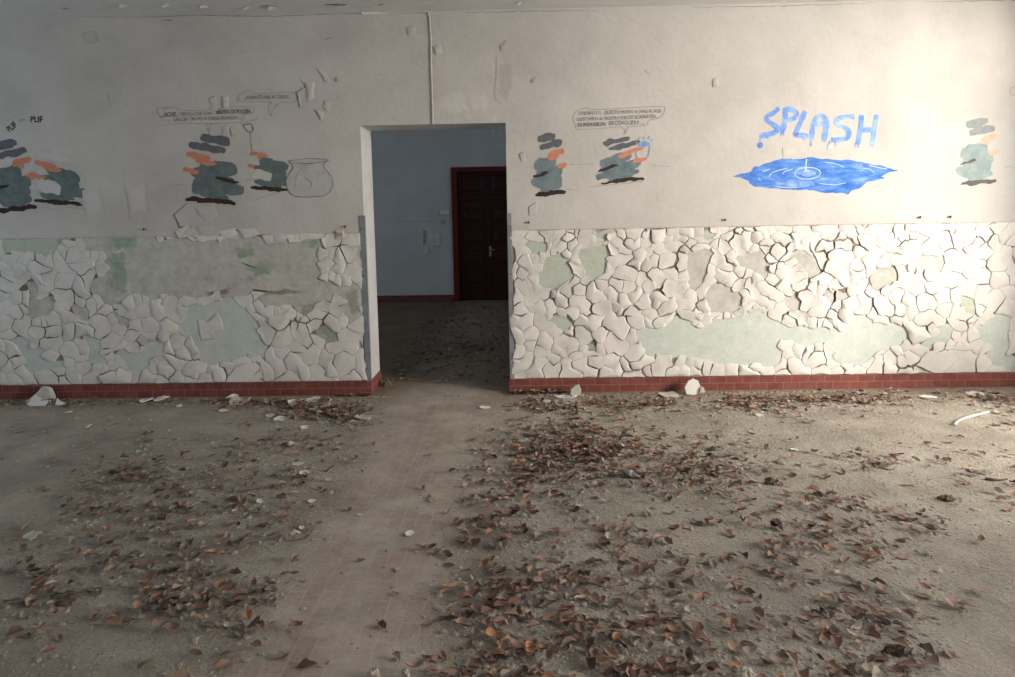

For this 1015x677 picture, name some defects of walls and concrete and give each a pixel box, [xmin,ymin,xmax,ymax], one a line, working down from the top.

peeling [0,234,364,385]
peeling [510,223,1015,377]